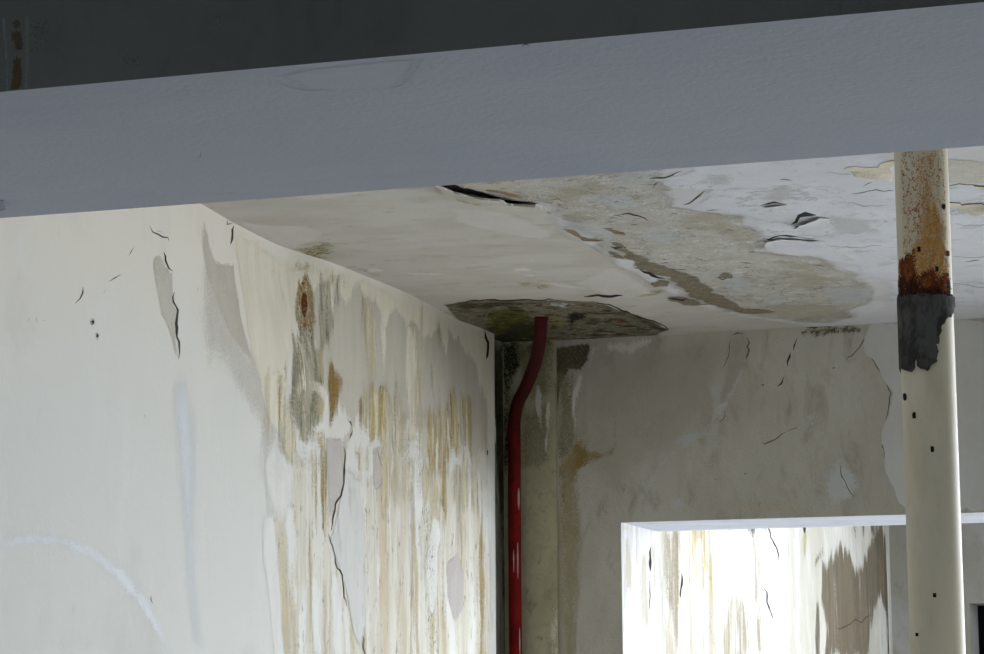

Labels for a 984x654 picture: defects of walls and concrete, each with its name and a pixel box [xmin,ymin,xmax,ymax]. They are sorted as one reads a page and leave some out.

spalling [514,153,899,324]
corrosion [897,149,952,296]
peeling [948,164,984,306]
leakage [196,185,863,654]
crack [776,326,830,387]
crack [848,328,891,417]
crack [328,420,353,606]
leakage [802,525,889,654]